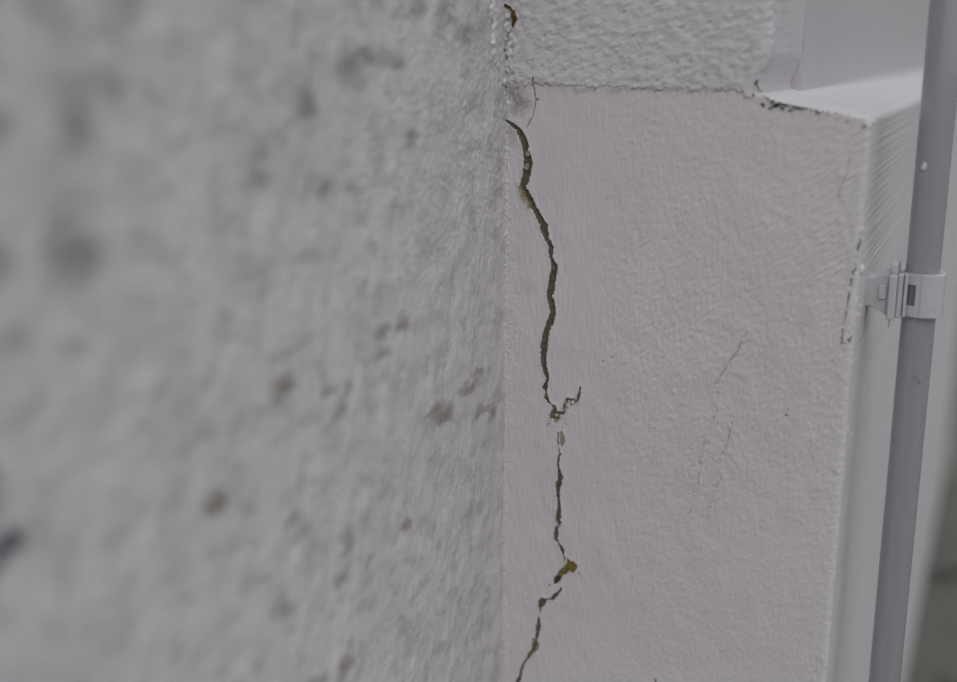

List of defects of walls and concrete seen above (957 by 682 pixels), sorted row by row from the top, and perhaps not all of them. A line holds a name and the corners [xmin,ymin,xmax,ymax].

crack [506,77,762,560]
crack [516,588,562,682]